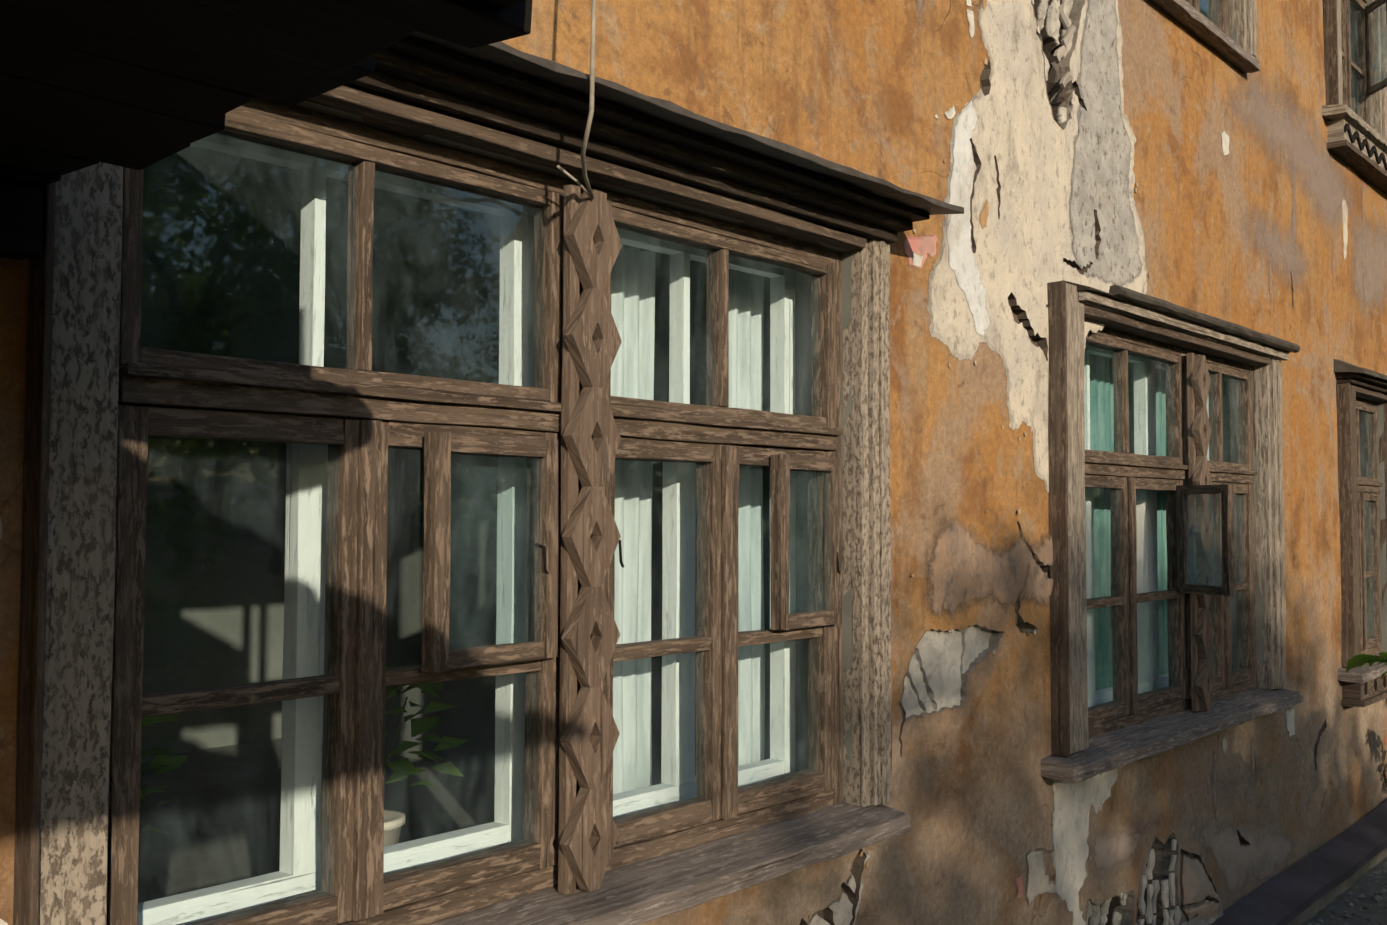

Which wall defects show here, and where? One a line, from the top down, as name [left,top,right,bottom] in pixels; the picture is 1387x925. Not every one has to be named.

peeling [904,0,1151,493]
crack [1008,292,1048,361]
crack [1017,521,1049,575]
flaking render [900,609,1038,722]
peeling [807,851,871,925]
peeling [1015,768,1181,925]
peeling [1193,826,1294,893]